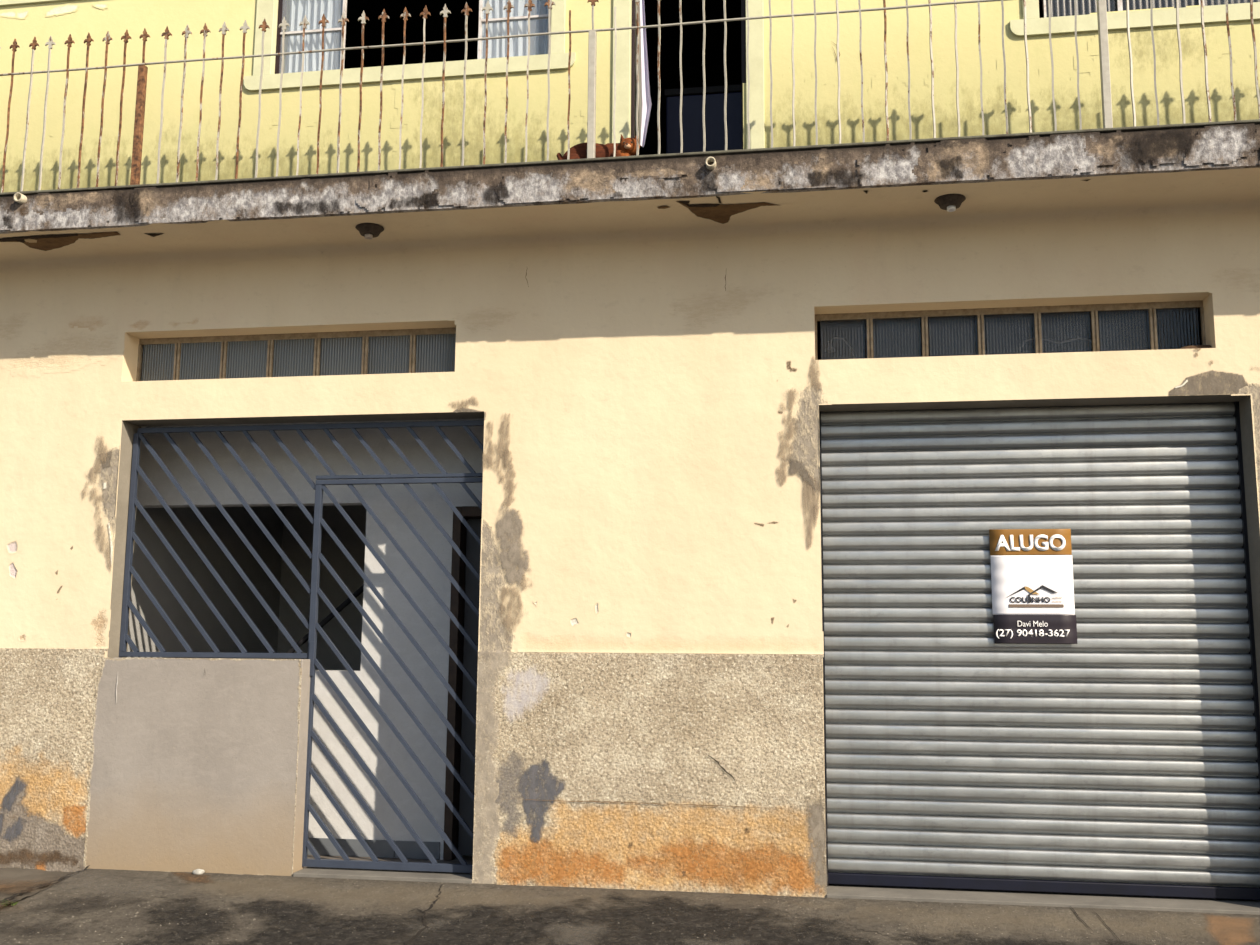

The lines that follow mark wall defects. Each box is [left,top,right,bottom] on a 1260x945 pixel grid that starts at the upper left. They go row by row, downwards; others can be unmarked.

peeling [0,190,120,251]
water stain [0,75,588,222]
peeling [130,130,1126,237]
peeling [1142,123,1260,166]
spalling [1169,361,1250,396]
water stain [493,755,827,898]